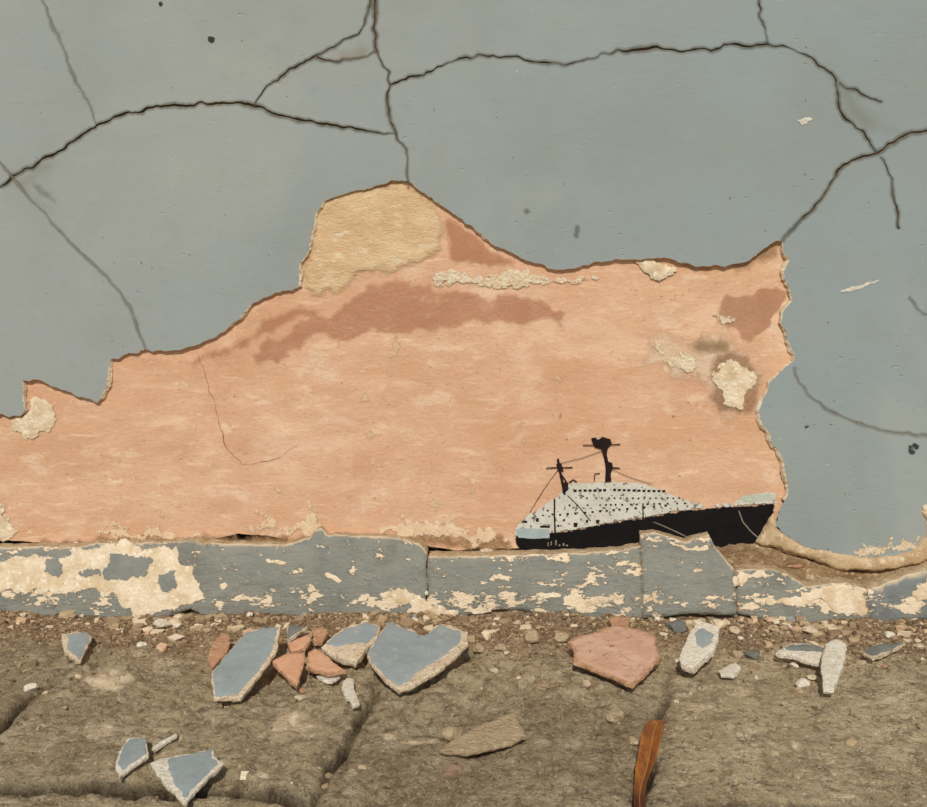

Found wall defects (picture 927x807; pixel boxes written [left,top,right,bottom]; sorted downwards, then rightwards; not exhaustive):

crack [0,0,927,349]
crack [199,360,296,465]
flaking render [0,180,795,618]
crack [794,368,927,436]
peeling [765,584,867,617]
peeling [911,579,927,601]